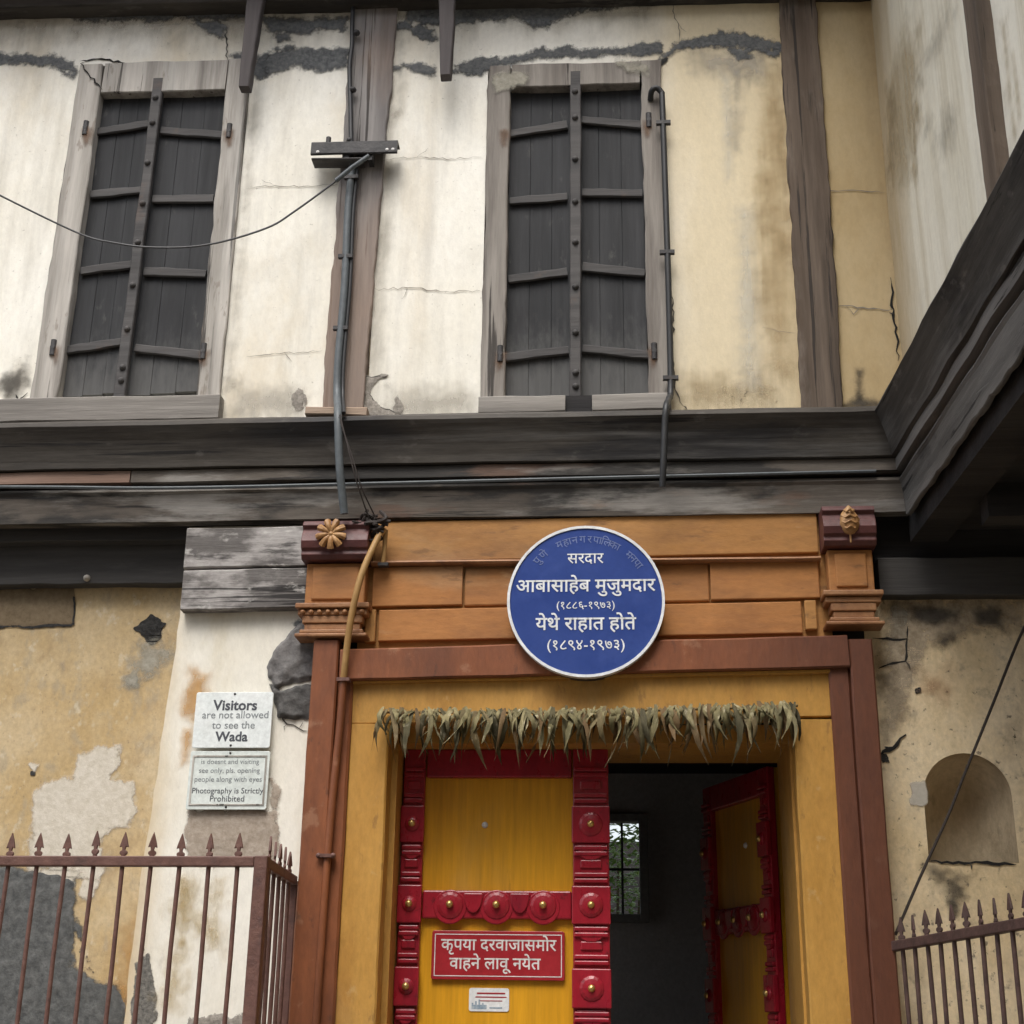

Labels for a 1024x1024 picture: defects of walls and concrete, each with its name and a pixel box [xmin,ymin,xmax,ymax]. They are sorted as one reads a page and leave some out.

crack [374,287,479,296]
crack [838,277,900,360]
flaking render [364,374,404,415]
flaking render [133,614,166,645]
crack [875,626,911,670]
flaking render [267,620,314,720]
damp [183,673,204,714]
crack [881,734,906,755]
peeling [27,744,137,900]